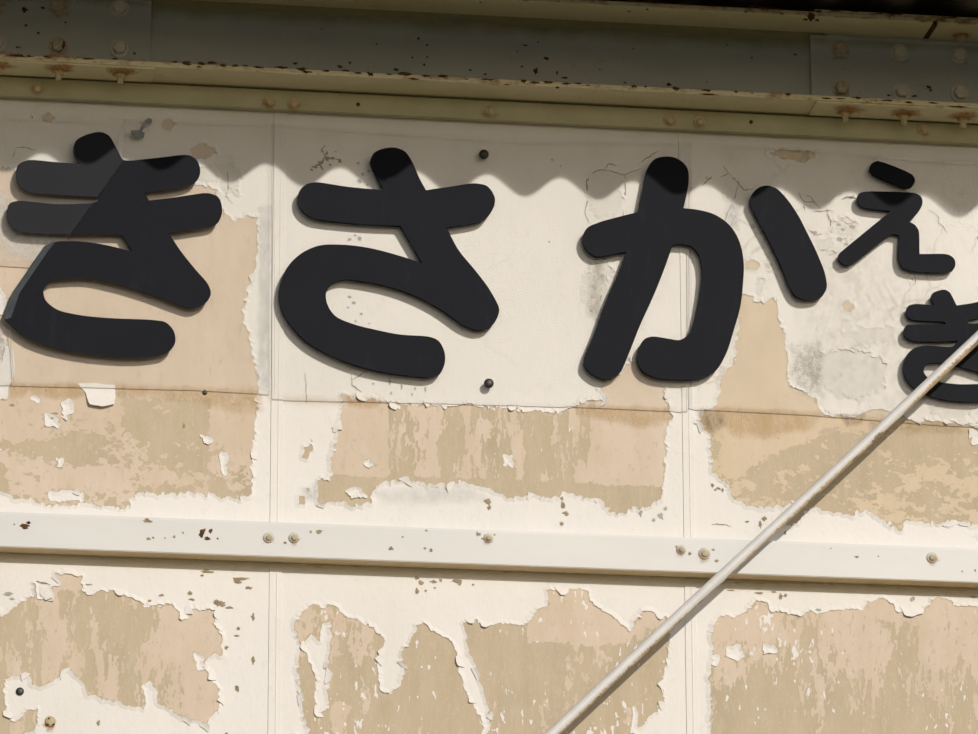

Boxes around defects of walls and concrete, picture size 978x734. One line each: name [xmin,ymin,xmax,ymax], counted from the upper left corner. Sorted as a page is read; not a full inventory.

peeling [0,139,264,512]
peeling [294,354,678,525]
peeling [579,256,619,318]
peeling [584,169,628,220]
peeling [721,170,753,212]
peeling [691,248,978,541]
peeling [813,212,861,254]
peeling [0,568,240,734]
spalling [415,576,474,594]
peeling [290,585,675,734]
peeling [703,591,978,734]